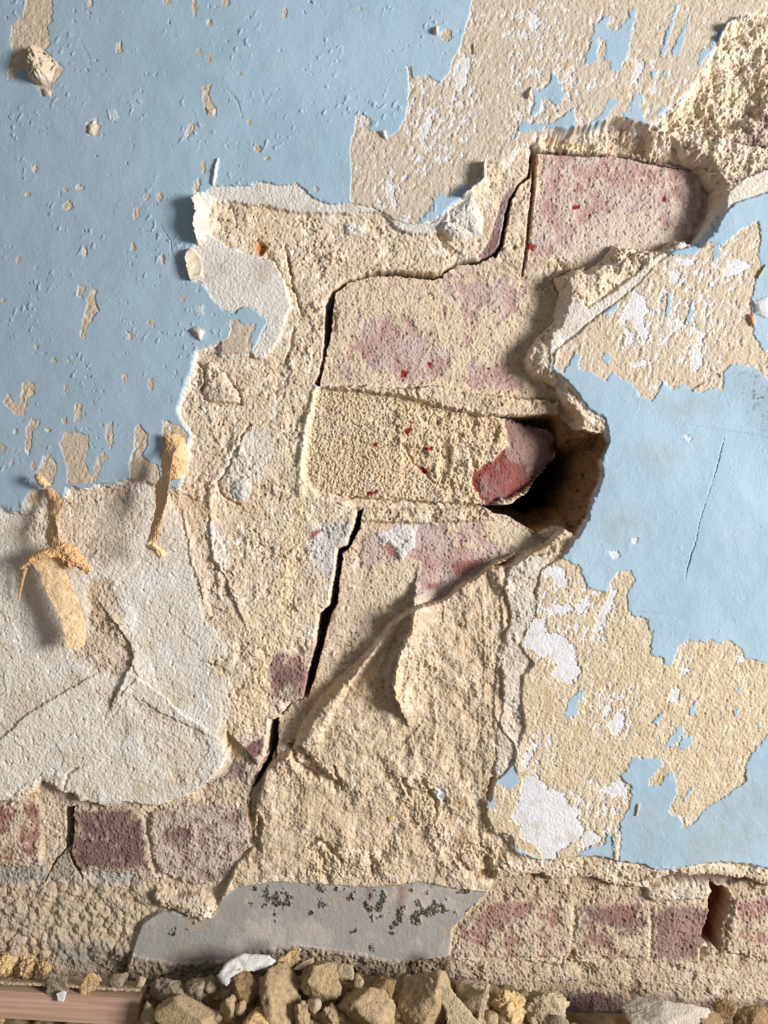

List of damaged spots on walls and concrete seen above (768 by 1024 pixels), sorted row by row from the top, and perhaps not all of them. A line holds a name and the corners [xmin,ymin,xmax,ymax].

peeling [185,0,768,359]
crack [315,145,708,390]
flaking render [0,144,530,989]
crack [248,510,363,841]
spalling [222,153,768,1014]
crack [677,423,768,576]